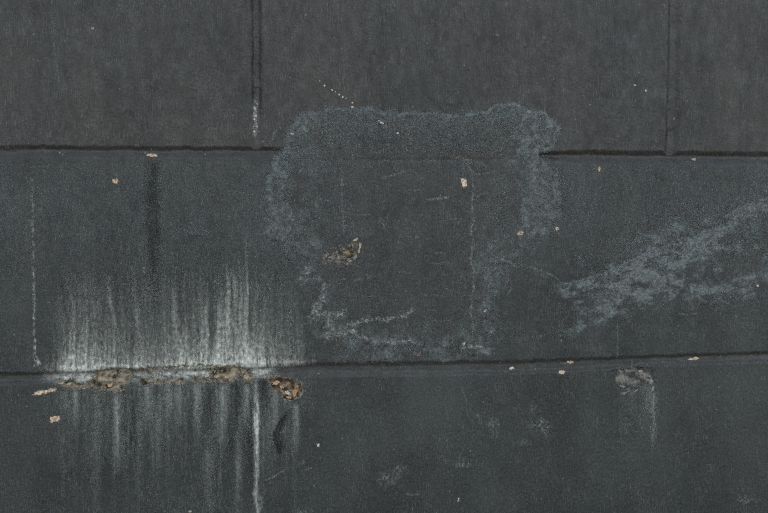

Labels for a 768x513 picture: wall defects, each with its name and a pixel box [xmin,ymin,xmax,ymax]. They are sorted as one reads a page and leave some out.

spalling [322,238,362,265]
spalling [34,363,255,395]
leakage [56,308,291,474]
spalling [268,375,303,401]
spalling [612,367,655,395]